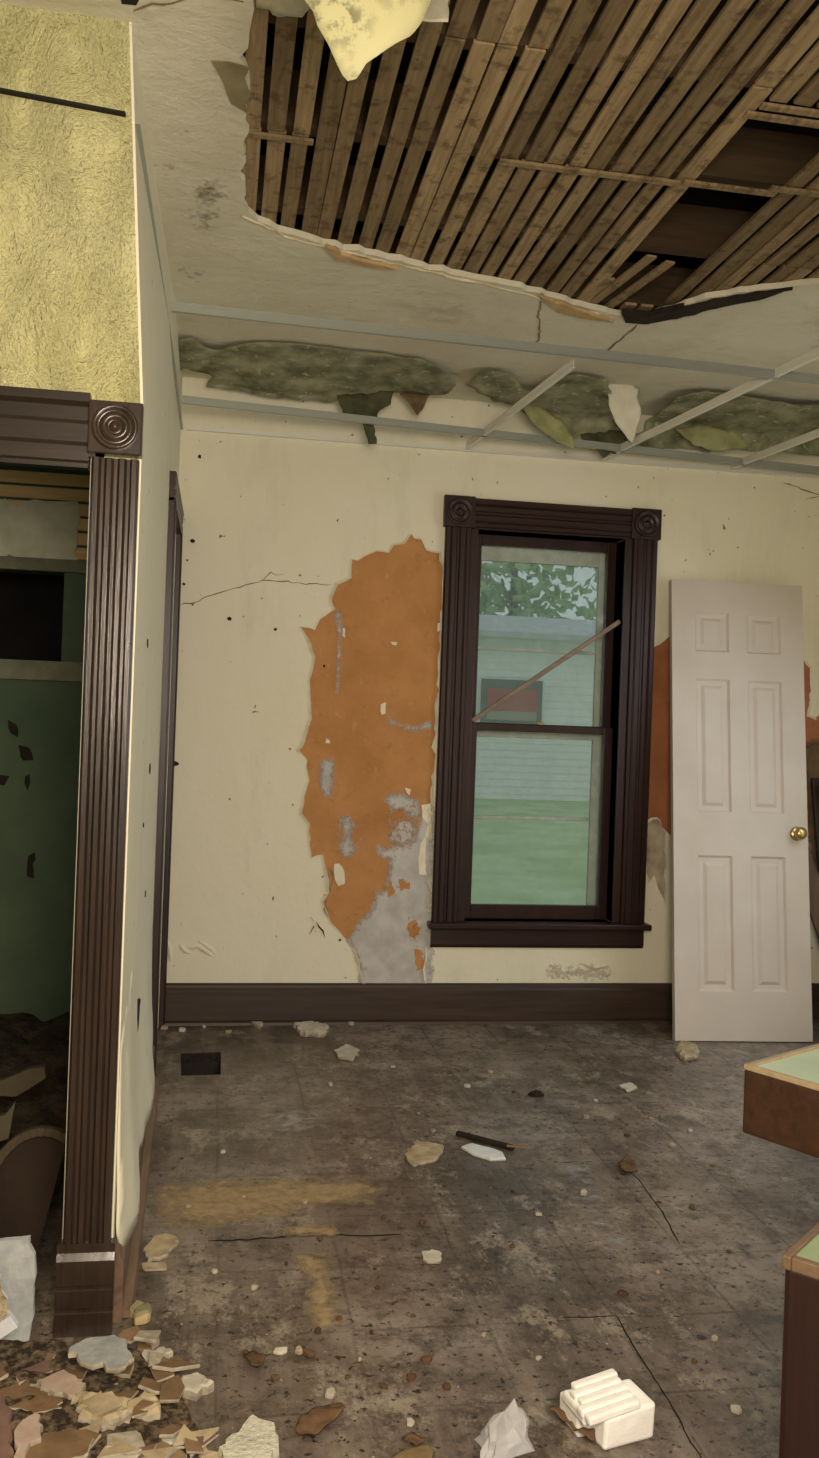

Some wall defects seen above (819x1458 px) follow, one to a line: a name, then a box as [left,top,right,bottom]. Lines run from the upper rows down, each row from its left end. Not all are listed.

peeling [326,243,399,270]
peeling [540,294,614,323]
crack [181,572,326,605]
peeling [804,661,819,745]
peeling [296,532,444,984]
peeling [646,637,671,903]